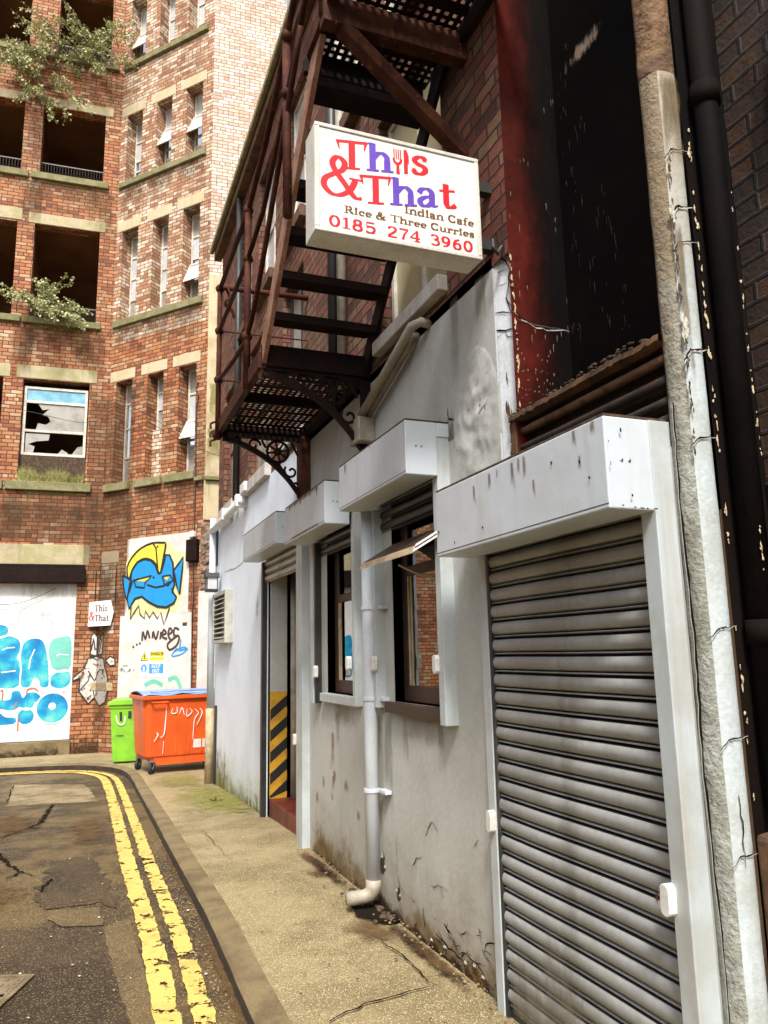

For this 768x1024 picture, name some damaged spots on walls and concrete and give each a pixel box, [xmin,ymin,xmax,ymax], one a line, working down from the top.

peeling [505,254,521,455]
peeling [669,198,694,413]
crack [0,785,53,894]
water stain [301,834,366,890]
crack [330,822,495,1021]